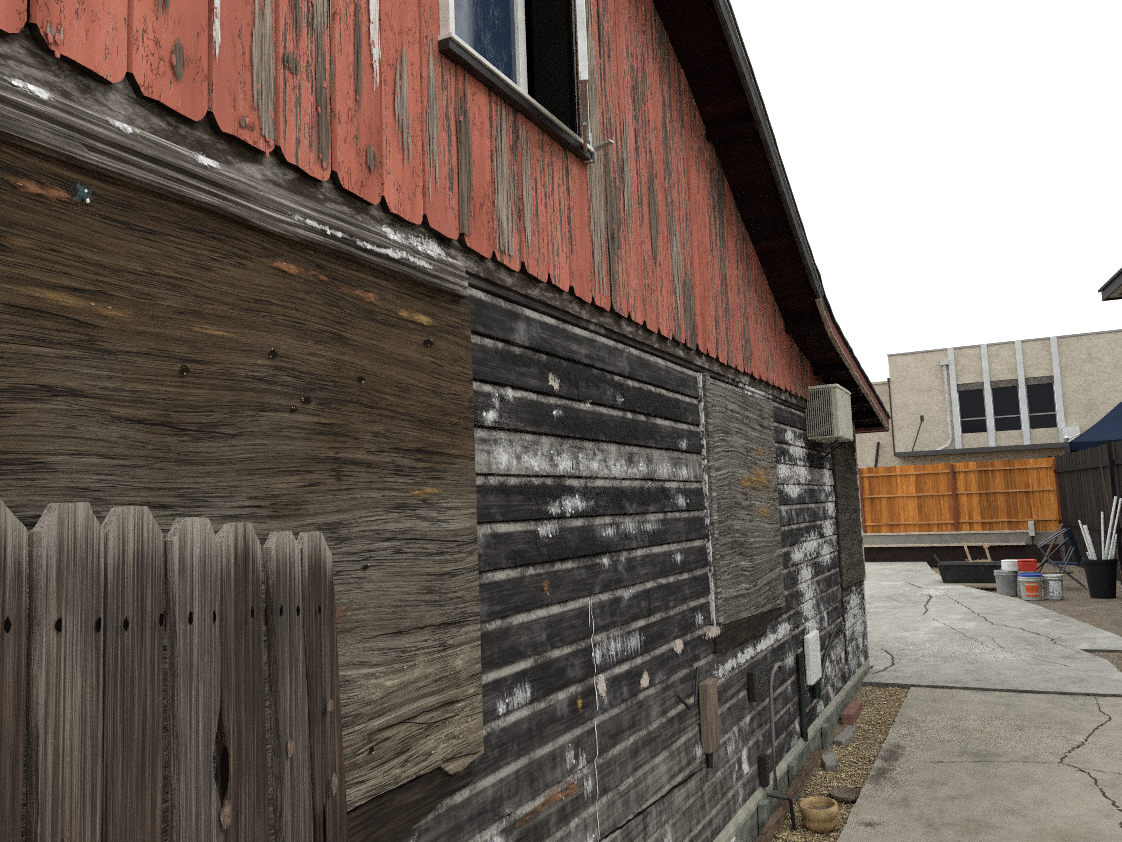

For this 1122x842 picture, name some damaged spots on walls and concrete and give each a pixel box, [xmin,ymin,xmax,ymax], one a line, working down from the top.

peeling [11,79,53,100]
peeling [212,0,221,57]
peeling [241,0,291,158]
peeling [355,0,381,165]
peeling [195,153,219,168]
peeling [490,97,533,256]
peeling [586,0,683,322]
peeling [357,225,456,269]
damp [493,339,690,444]
damp [482,477,678,510]
damp [479,534,629,572]
crack [909,583,1122,827]